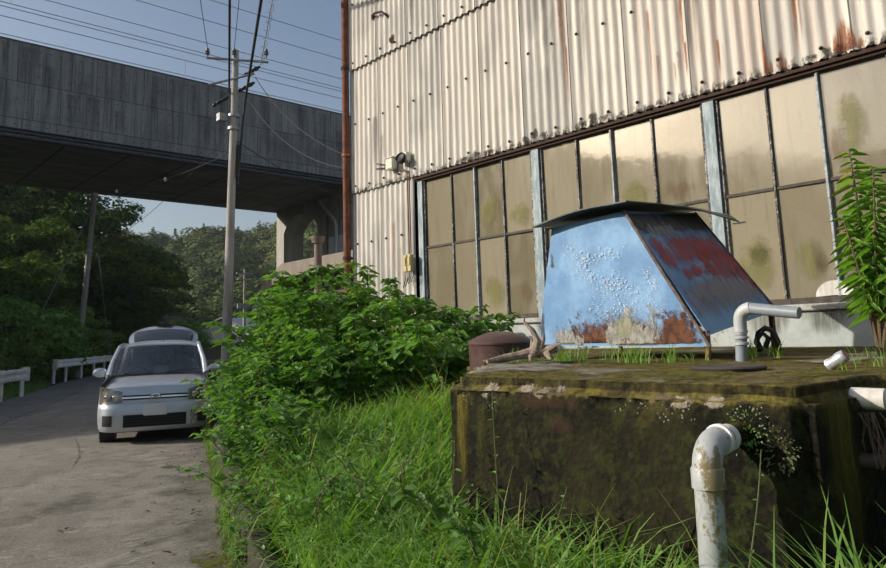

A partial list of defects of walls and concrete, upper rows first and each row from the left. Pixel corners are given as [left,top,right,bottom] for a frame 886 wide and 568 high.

corrosion [557,0,568,88]
corrosion [762,45,787,73]
corrosion [833,22,863,54]
peeling [550,245,760,345]
spalling [671,395,692,409]
spalling [704,396,725,409]
leakage [826,394,869,543]